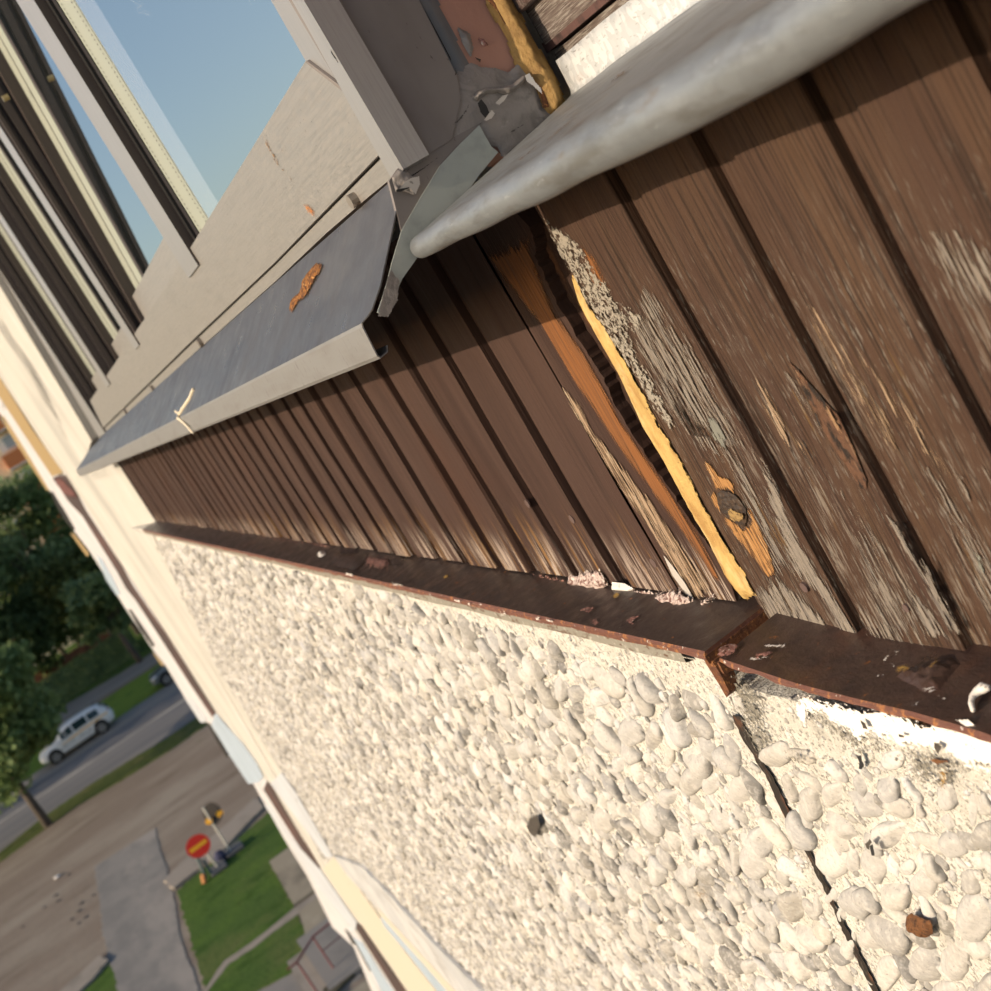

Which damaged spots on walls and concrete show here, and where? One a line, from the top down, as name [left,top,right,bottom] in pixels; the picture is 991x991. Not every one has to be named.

peeling [543,218,961,667]
crack [733,715,789,819]
crack [804,850,878,991]
corrosion [905,913,933,938]